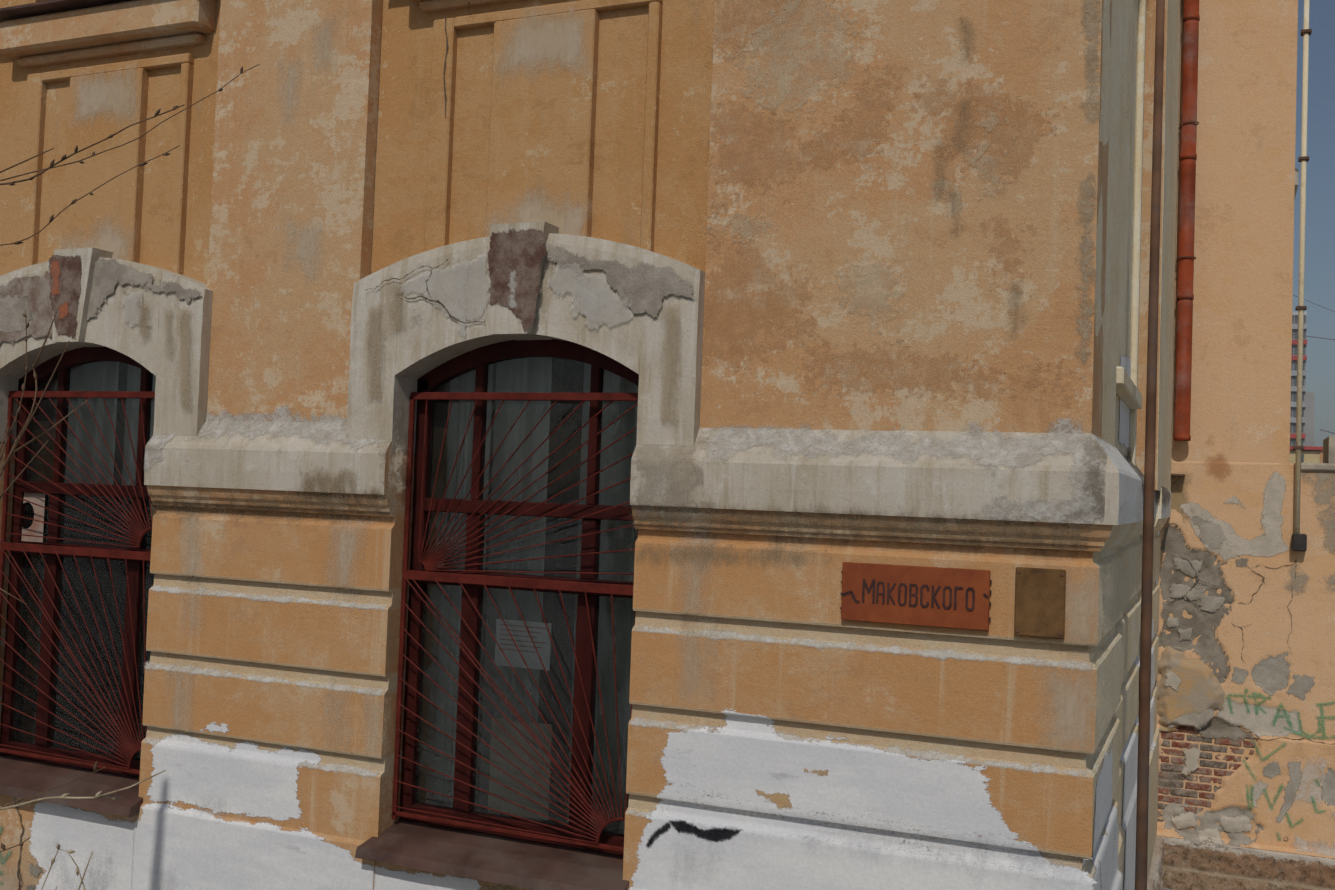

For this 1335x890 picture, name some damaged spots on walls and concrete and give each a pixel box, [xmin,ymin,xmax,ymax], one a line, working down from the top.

flaking render [0,254,82,345]
crack [366,259,485,323]
flaking render [394,229,694,336]
crack [1166,555,1297,664]
flaking render [1157,472,1335,850]